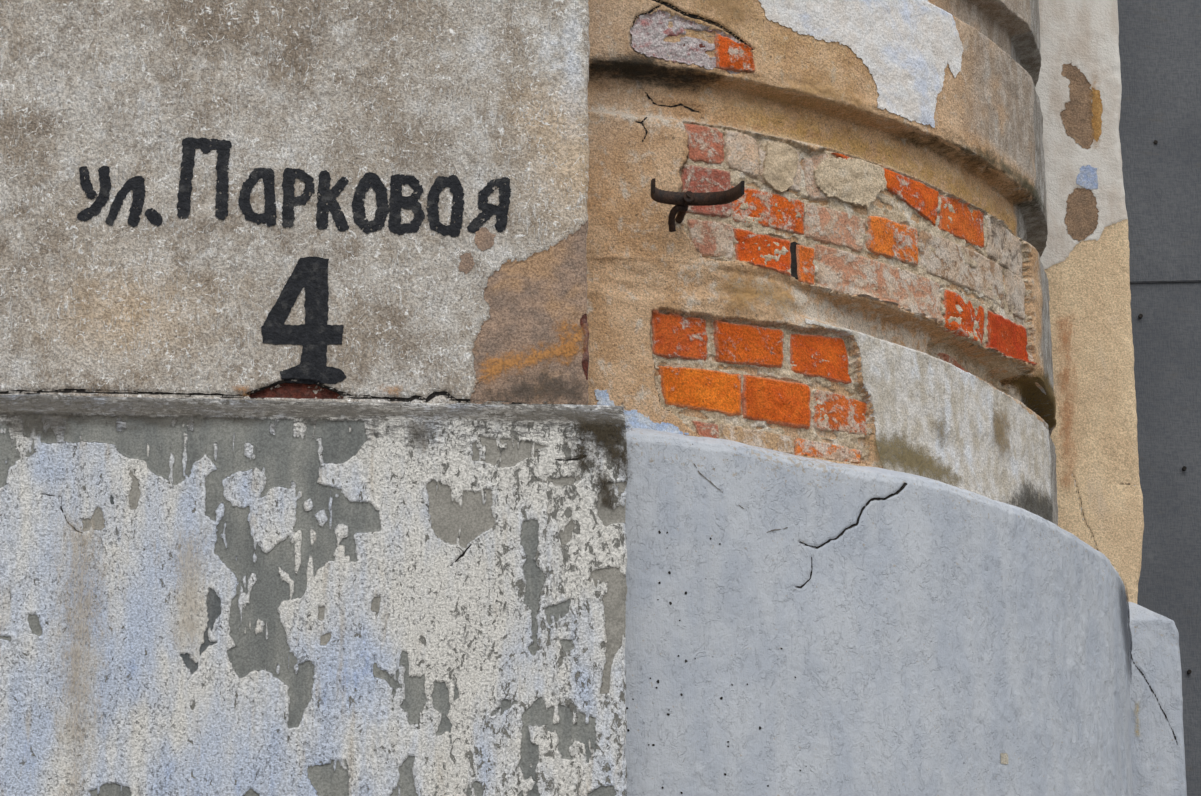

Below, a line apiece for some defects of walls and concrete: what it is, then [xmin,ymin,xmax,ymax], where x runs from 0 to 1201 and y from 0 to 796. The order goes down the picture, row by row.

flaking render [630,9,755,75]
crack [632,0,754,50]
peeling [1060,62,1103,149]
peeling [470,220,589,405]
flaking render [650,121,1144,604]
peeling [0,414,381,728]
peeling [426,480,495,548]
peeling [520,519,571,655]
crack [766,483,907,588]
peeling [373,651,459,744]
peeling [491,697,596,796]
crack [1130,645,1177,742]